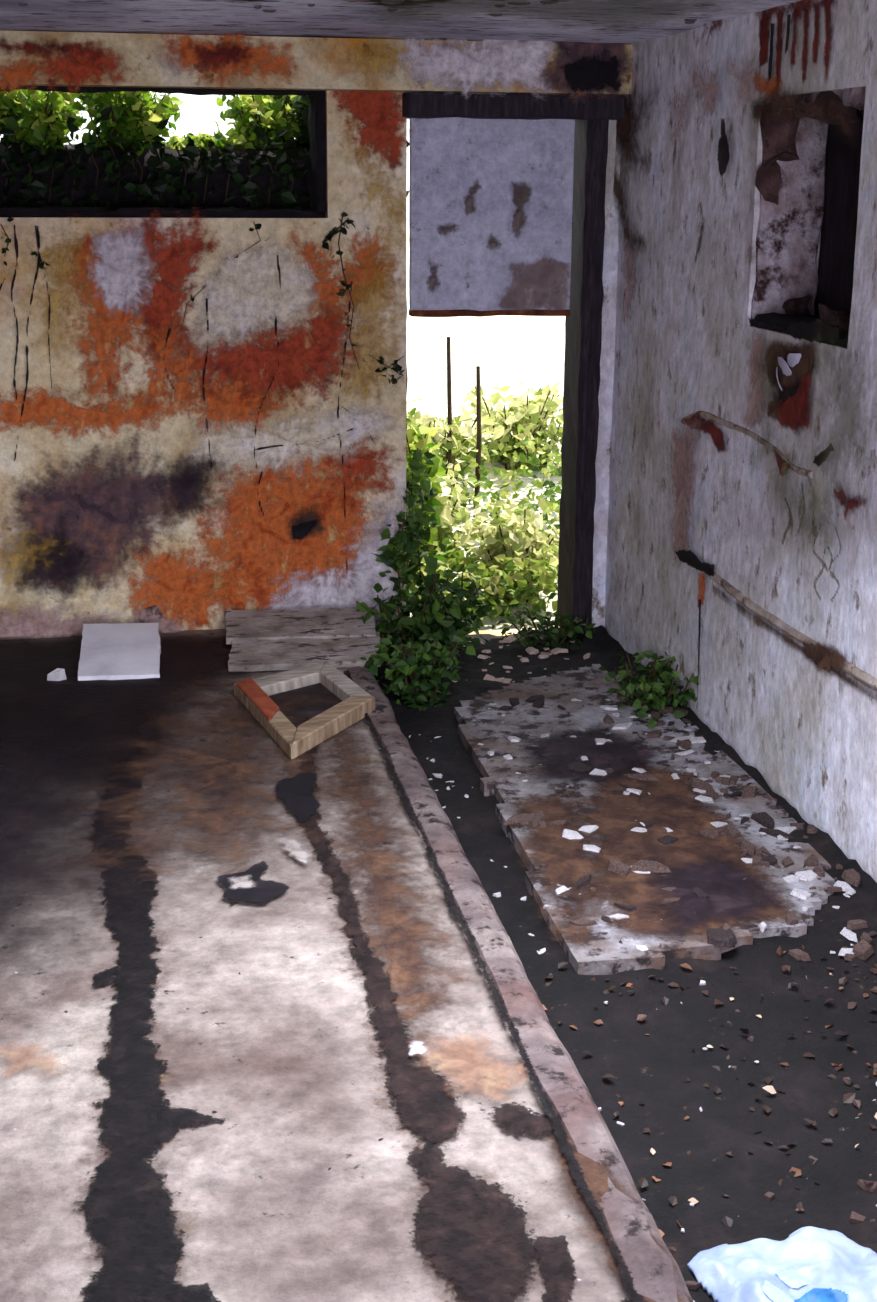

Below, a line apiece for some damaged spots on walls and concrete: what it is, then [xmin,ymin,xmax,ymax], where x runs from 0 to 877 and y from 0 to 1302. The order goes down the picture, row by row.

corrosion [166,34,293,85]
peeling [220,0,282,13]
peeling [343,0,452,12]
corrosion [672,0,836,145]
flaking render [752,87,863,205]
corrosion [0,214,397,437]
flaking render [745,295,850,434]
corrosion [128,436,400,632]
leakage [0,438,523,1098]